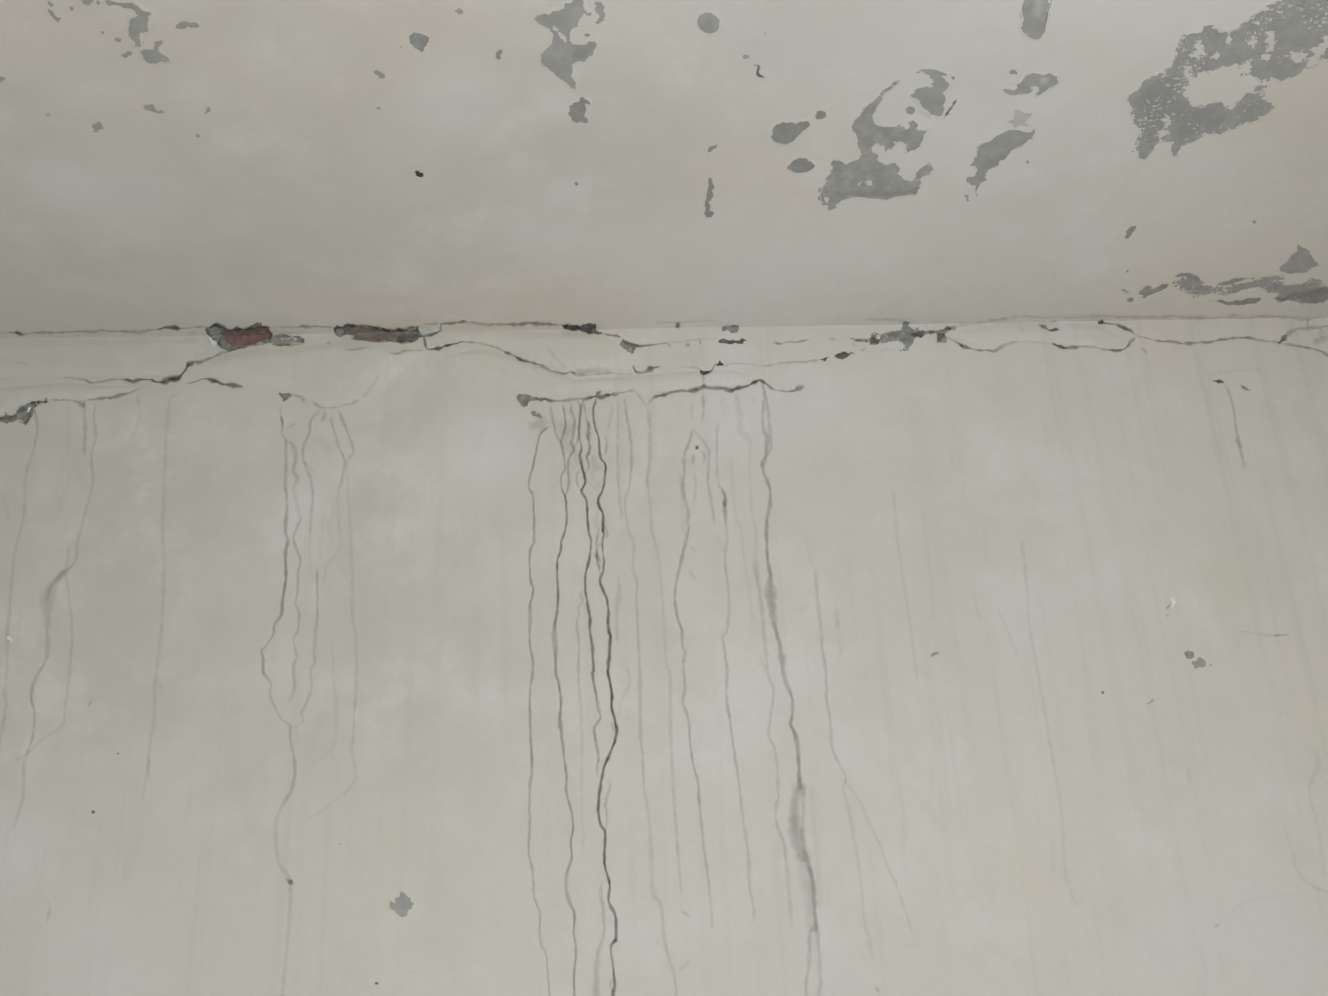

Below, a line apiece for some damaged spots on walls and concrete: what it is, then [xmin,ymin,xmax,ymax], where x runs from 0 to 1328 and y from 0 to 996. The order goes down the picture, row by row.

peeling [1017,0,1055,42]
peeling [530,0,605,125]
peeling [1123,0,1328,161]
peeling [768,66,955,212]
peeling [963,127,1039,194]
peeling [1127,273,1261,305]
crack [418,326,460,350]
crack [126,363,236,386]
crack [515,356,569,408]
crack [633,360,766,396]
flaking render [0,398,47,426]
leakage [593,584,618,901]